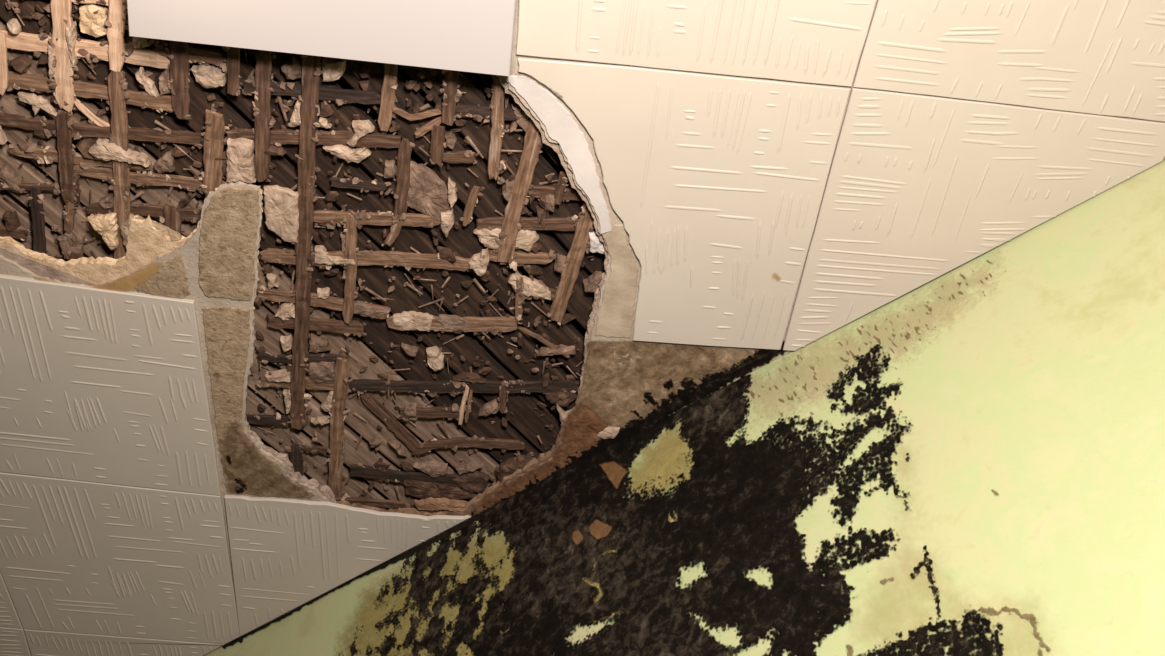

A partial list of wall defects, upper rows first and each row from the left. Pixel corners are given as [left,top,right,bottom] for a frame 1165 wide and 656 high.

flaking render [0,0,611,516]
flaking render [597,426,620,439]
flaking render [600,461,627,489]
leakage [339,260,992,656]
leakage [846,545,1050,656]